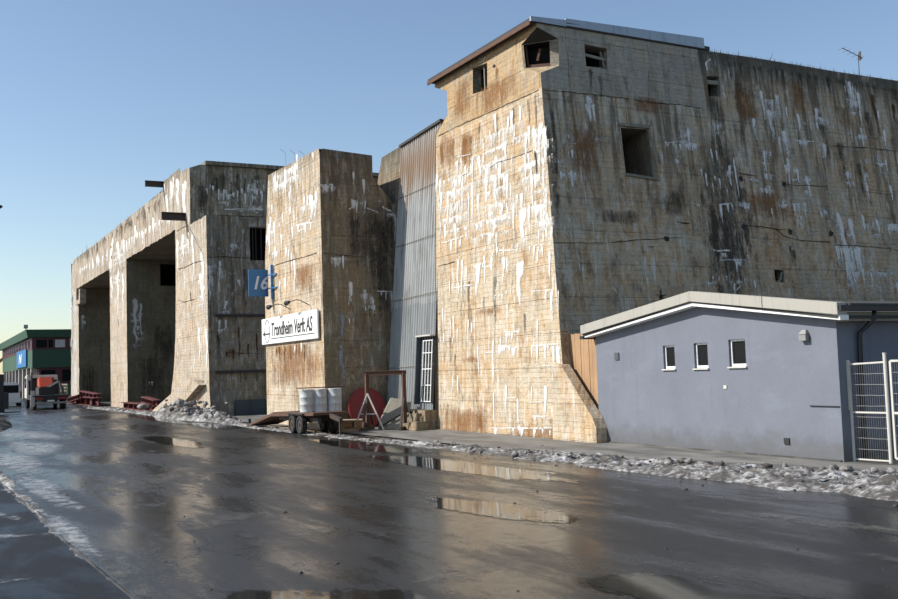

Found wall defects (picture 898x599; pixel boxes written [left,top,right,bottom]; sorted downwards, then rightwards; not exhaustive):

damp [79,177,187,347]
damp [176,232,231,372]
damp [199,154,334,293]
rust [276,343,318,385]
damp [348,171,397,315]
damp [436,96,576,381]
damp [491,385,553,437]
damp [665,128,697,164]
damp [697,65,898,293]